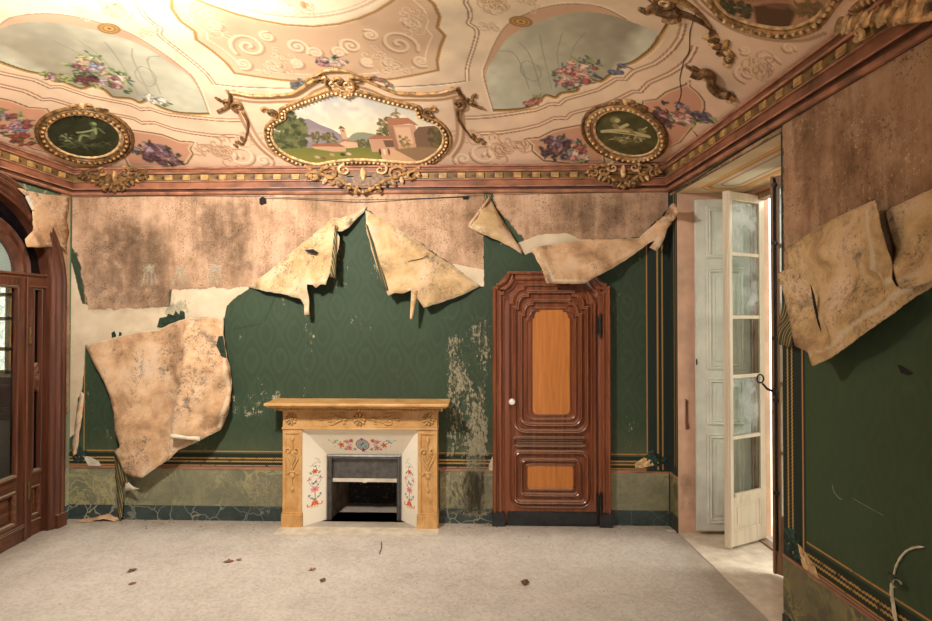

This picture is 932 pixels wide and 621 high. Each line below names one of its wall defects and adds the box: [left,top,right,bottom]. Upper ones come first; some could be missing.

flaking render [782,37,932,287]
flaking render [59,192,668,456]